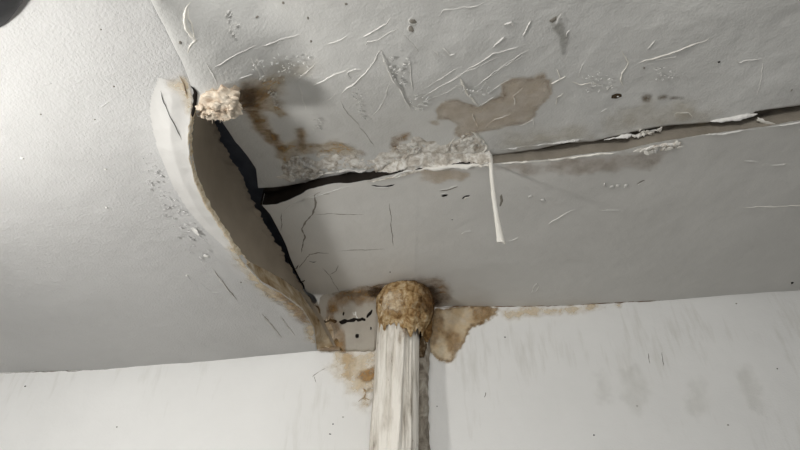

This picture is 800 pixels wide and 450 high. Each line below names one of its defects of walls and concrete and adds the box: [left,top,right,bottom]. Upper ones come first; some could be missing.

leakage [239,80,294,161]
crack [453,105,800,164]
crack [260,168,422,324]
leakage [328,286,382,312]
leakage [424,280,497,362]
leakage [324,340,375,390]